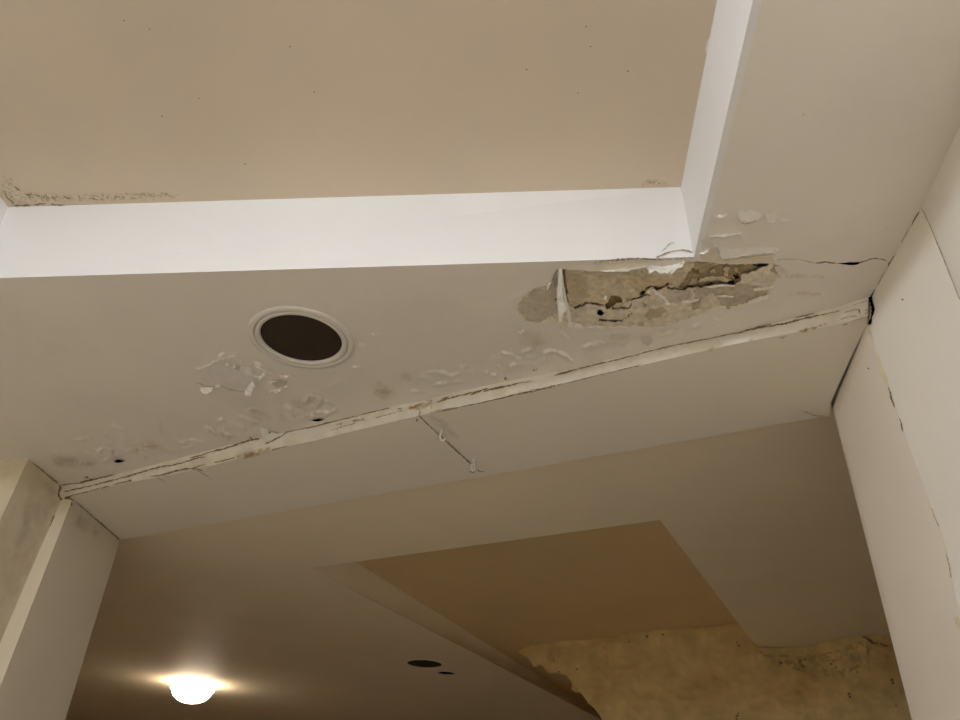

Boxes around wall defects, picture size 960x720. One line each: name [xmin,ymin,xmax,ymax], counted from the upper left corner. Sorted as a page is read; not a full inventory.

leakage [0,170,180,207]
spalling [516,209,793,346]
crack [35,209,960,540]